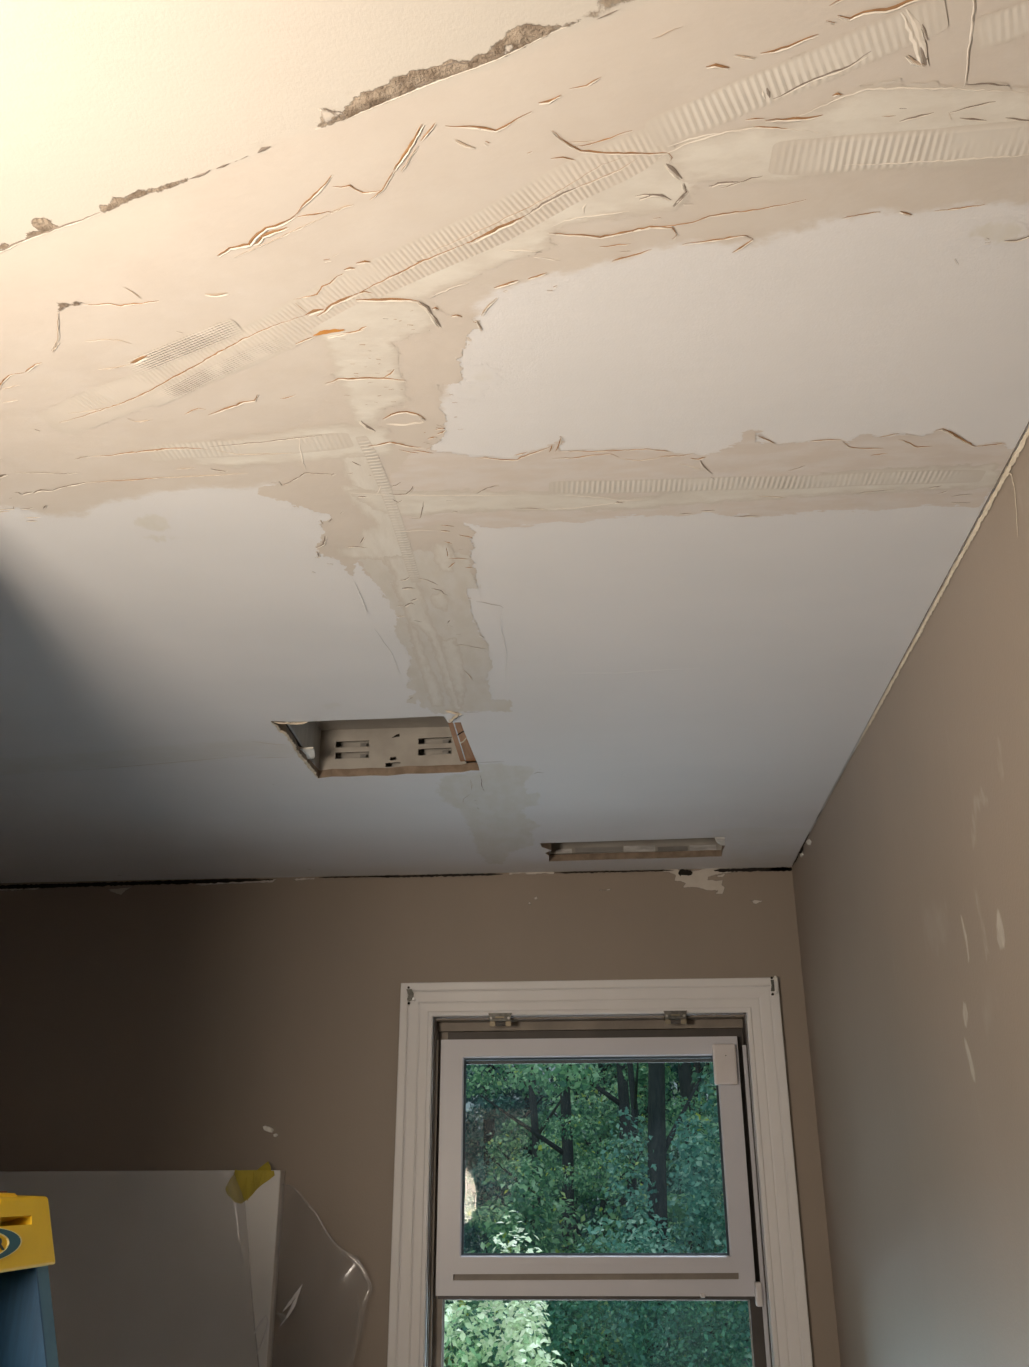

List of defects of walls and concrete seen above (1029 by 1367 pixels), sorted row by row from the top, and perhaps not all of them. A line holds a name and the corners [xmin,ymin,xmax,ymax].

crack [706,0,921,129]
flaking render [900,8,929,68]
crack [0,77,1029,680]
peeling [660,868,746,894]